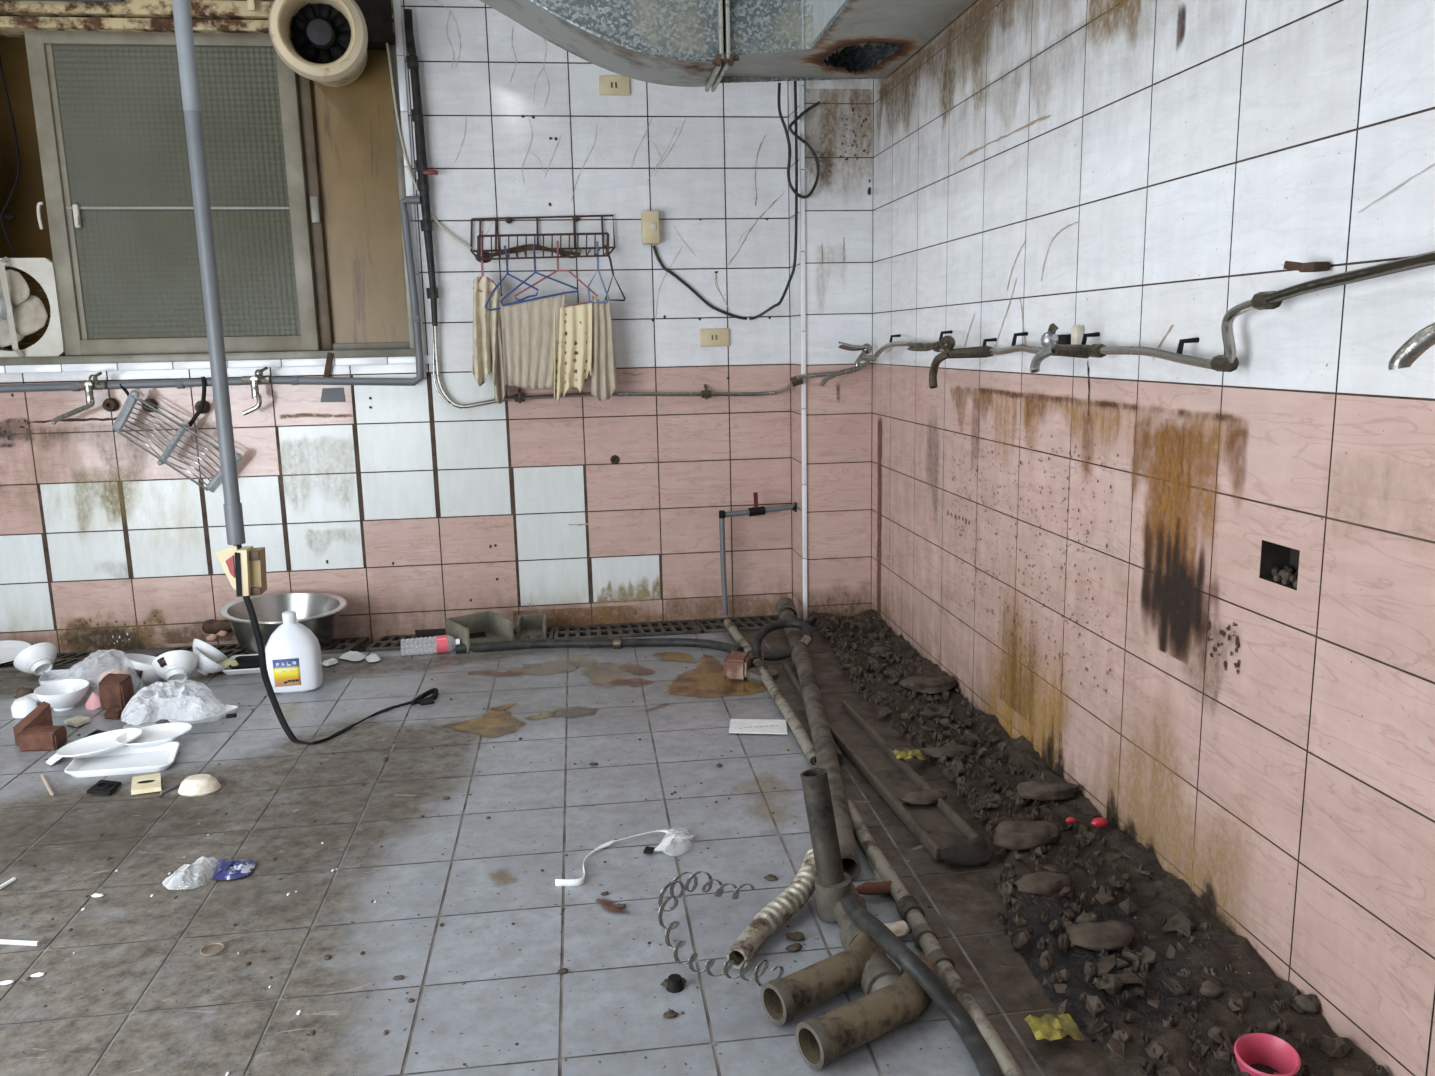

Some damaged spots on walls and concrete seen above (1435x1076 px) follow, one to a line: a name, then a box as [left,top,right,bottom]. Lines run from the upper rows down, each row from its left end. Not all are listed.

leakage [820,1,1007,173]
leakage [1089,0,1140,35]
mould [58,610,233,652]
rust [951,361,1245,778]